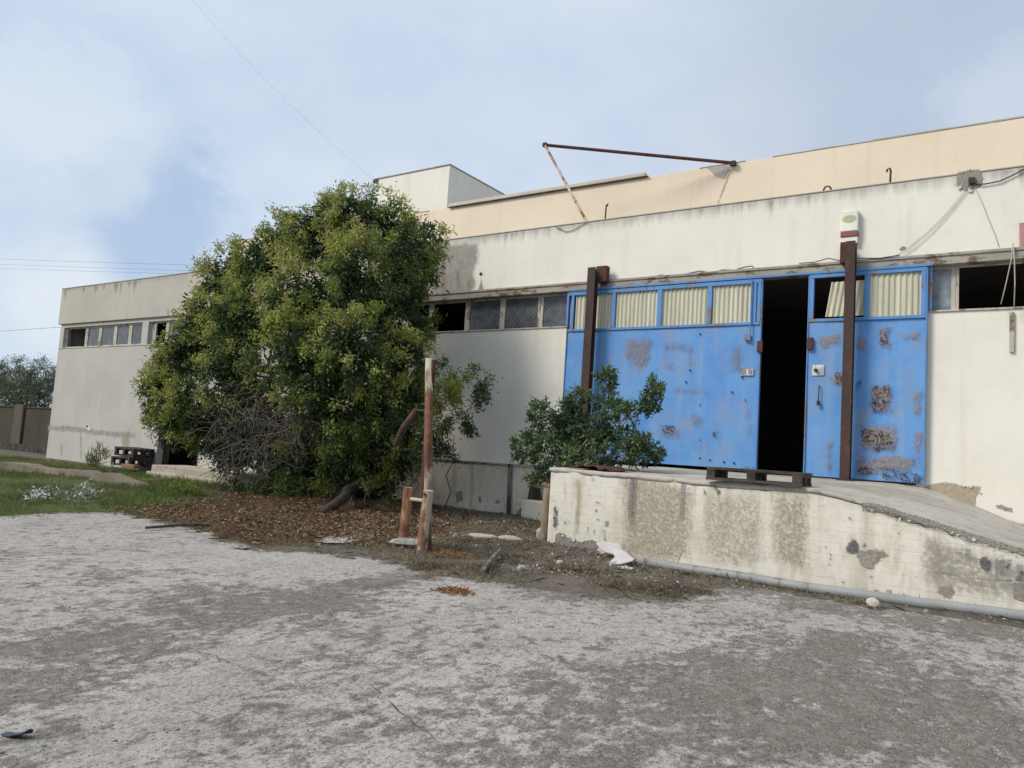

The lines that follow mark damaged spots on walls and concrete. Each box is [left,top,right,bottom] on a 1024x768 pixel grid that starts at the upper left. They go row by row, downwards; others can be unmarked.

leakage [429,245,477,294]
corrosion [855,382,890,414]
corrosion [861,429,896,452]
corrosion [858,467,923,486]
spalling [924,481,981,506]
leakage [704,485,756,561]
leakage [774,498,807,566]
leakage [925,542,1017,593]